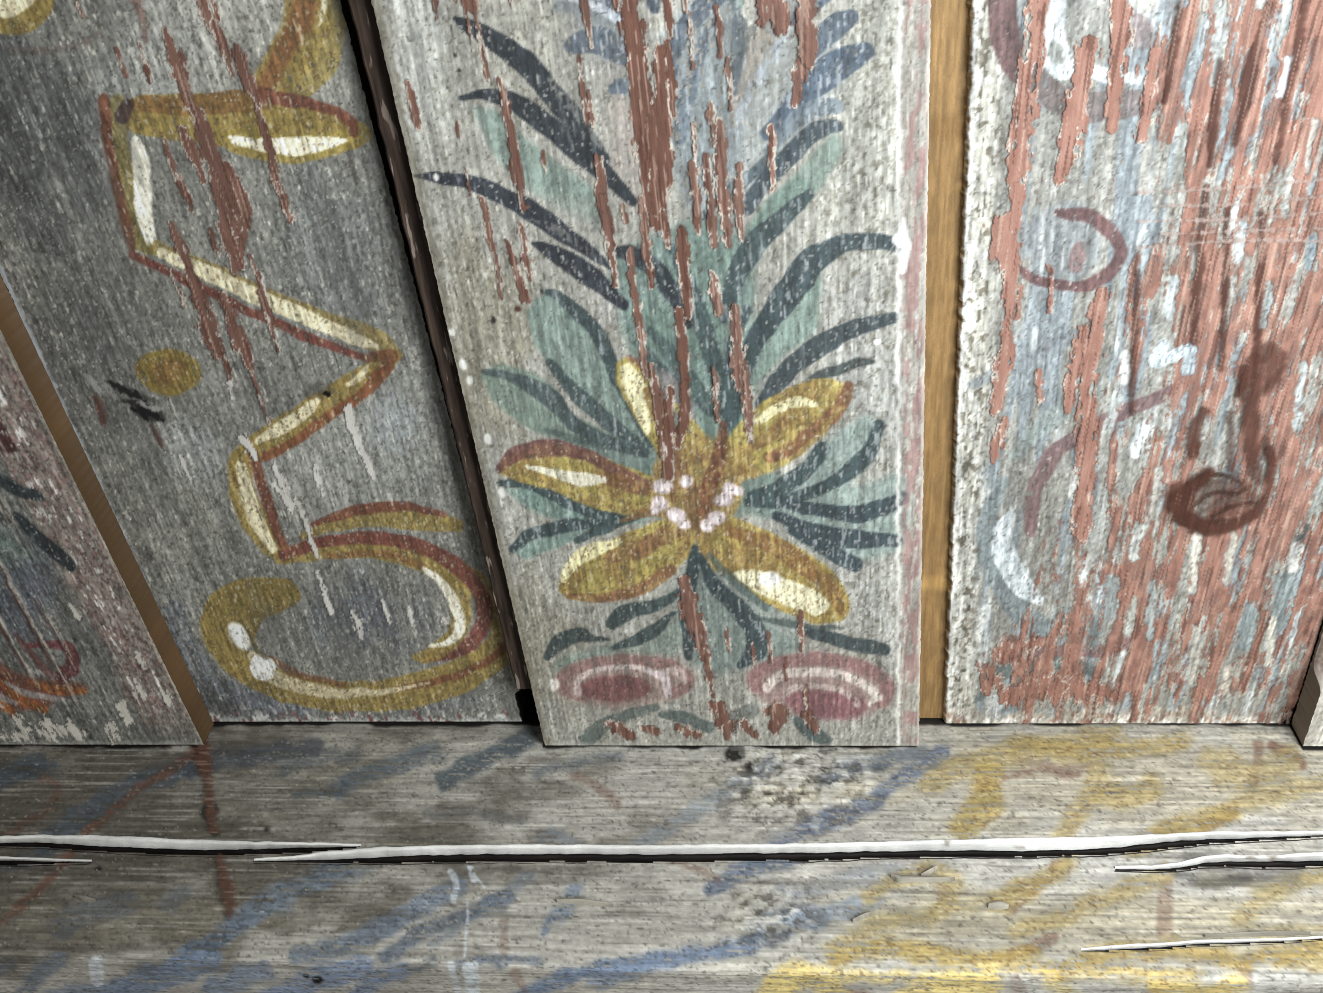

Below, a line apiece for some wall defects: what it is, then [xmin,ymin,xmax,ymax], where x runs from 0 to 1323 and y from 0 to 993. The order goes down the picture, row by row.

peeling [168,221,271,426]
peeling [162,27,280,353]
peeling [196,0,297,224]
peeling [238,432,334,615]
peeling [343,403,376,481]
peeling [405,79,422,132]
peeling [455,0,534,304]
peeling [594,0,755,483]
peeling [756,0,820,109]
peeling [976,0,1323,724]
crack [0,831,1323,873]
crack [1081,936,1323,953]